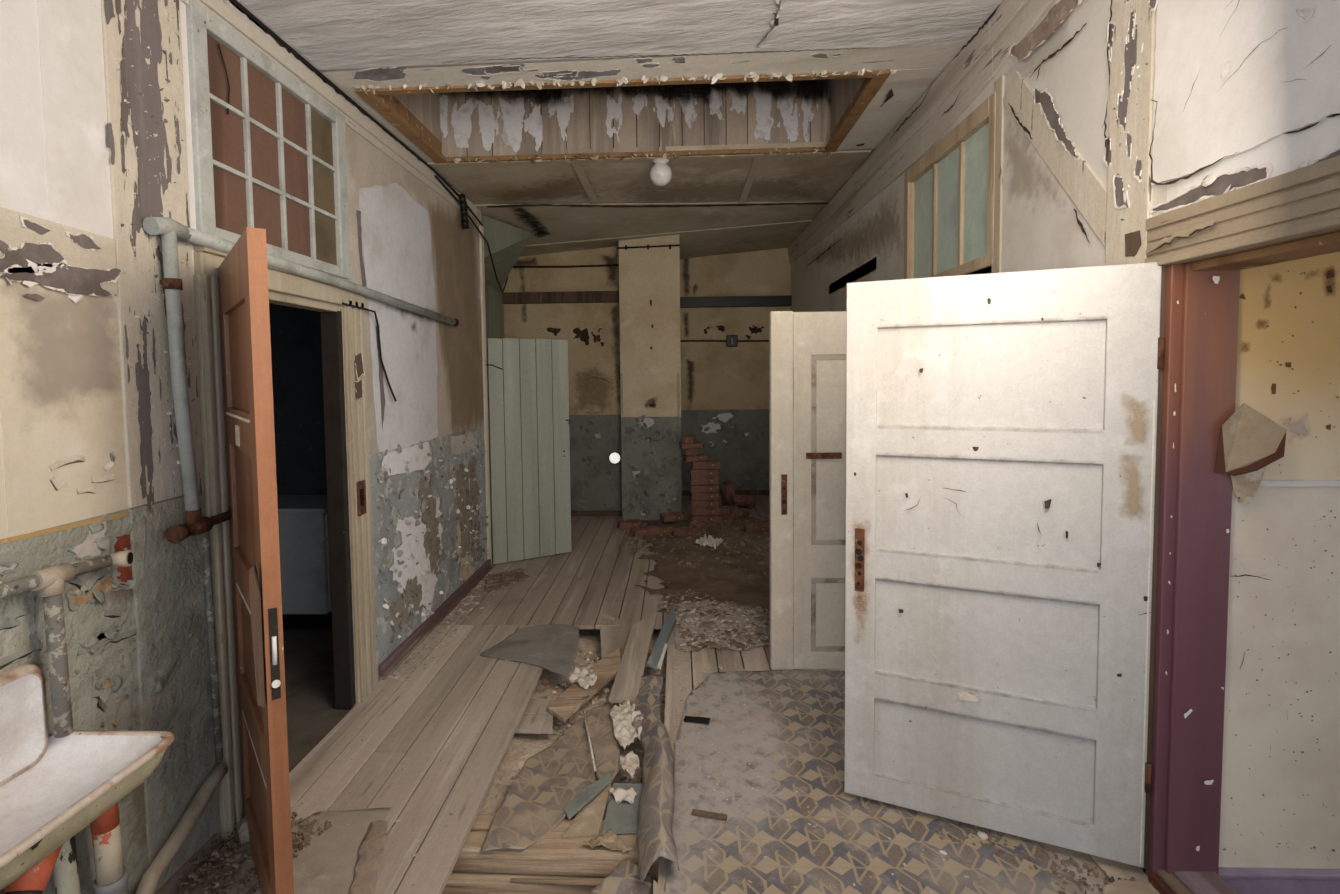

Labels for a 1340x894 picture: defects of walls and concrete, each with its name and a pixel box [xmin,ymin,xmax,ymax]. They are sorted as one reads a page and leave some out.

crack [442,0,867,64]
peeling [1009,0,1082,60]
leakage [441,79,831,104]
peeling [1033,87,1079,161]
peeling [1104,0,1158,227]
crack [1184,27,1288,108]
peeling [1150,163,1272,213]
peeling [1296,147,1340,170]
peeling [0,216,126,303]
peeling [354,183,489,643]
peeling [699,412,750,449]